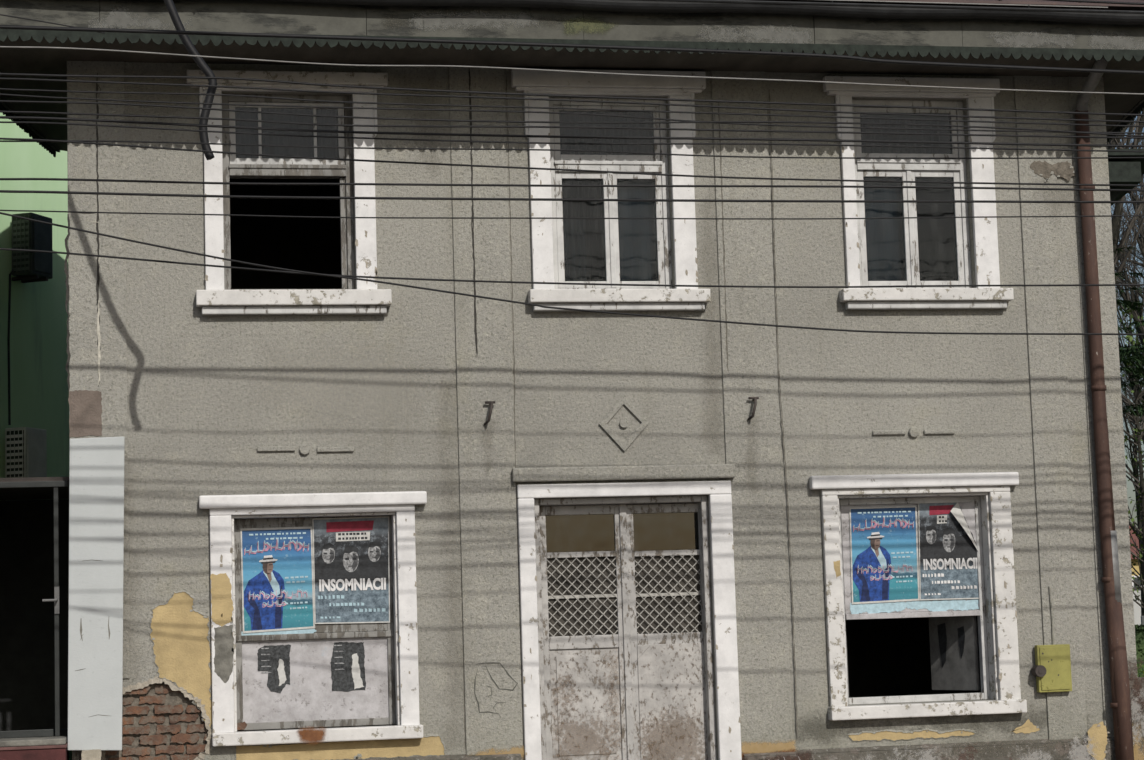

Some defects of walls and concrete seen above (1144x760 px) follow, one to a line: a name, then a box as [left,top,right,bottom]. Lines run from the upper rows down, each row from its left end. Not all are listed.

spalling [1030,160,1076,182]
spalling [101,548,247,760]
rust [298,727,324,743]
peeling [234,733,446,760]
peeling [847,728,977,742]
peeling [1011,719,1040,736]
peeling [1086,721,1110,760]